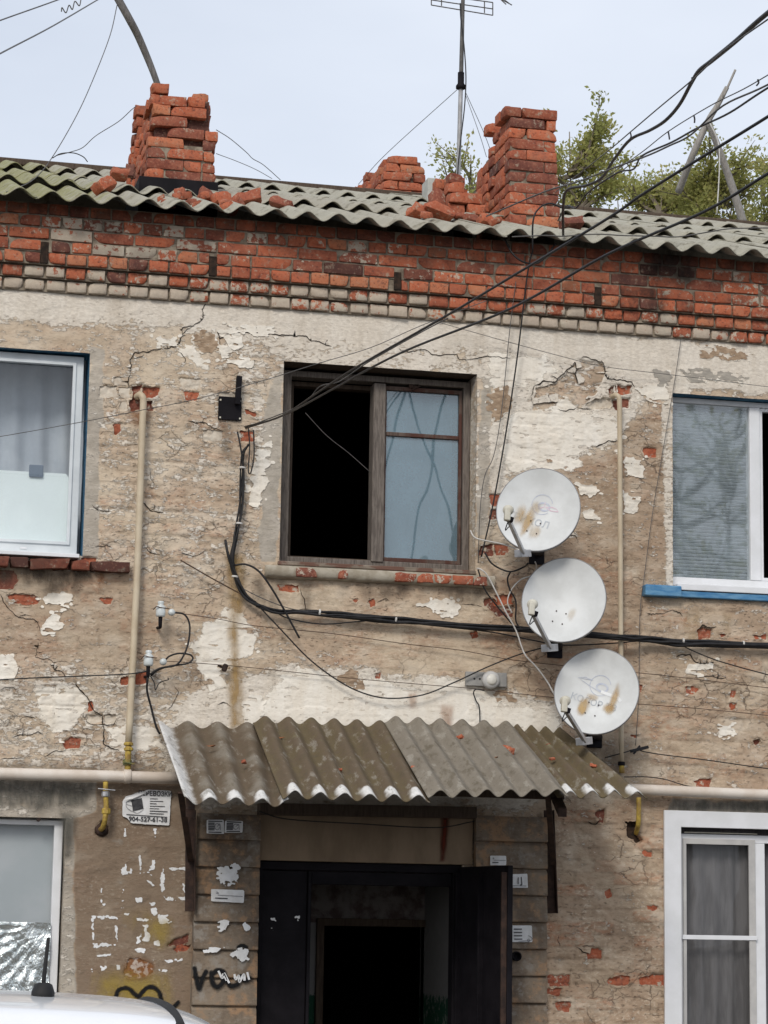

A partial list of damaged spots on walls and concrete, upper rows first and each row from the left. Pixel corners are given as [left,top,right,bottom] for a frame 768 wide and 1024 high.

crack [121,304,332,387]
peeling [239,429,275,508]
peeling [479,344,755,524]
peeling [0,555,100,637]
peeling [416,597,461,618]
crack [0,594,118,759]
peeling [185,605,260,696]
leakage [231,624,240,726]
flaking render [607,973,664,987]